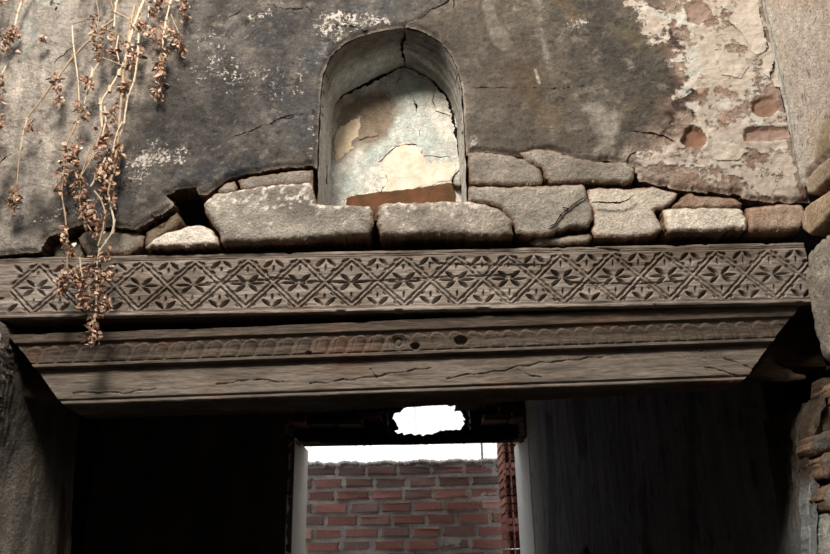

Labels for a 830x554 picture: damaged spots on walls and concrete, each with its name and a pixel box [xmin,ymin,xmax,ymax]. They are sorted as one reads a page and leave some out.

leakage [187,29,306,105]
crack [229,114,293,139]
peeling [334,115,361,161]
leakage [313,10,395,63]
crack [336,0,584,194]
peeling [346,142,461,209]
peeling [623,0,830,362]